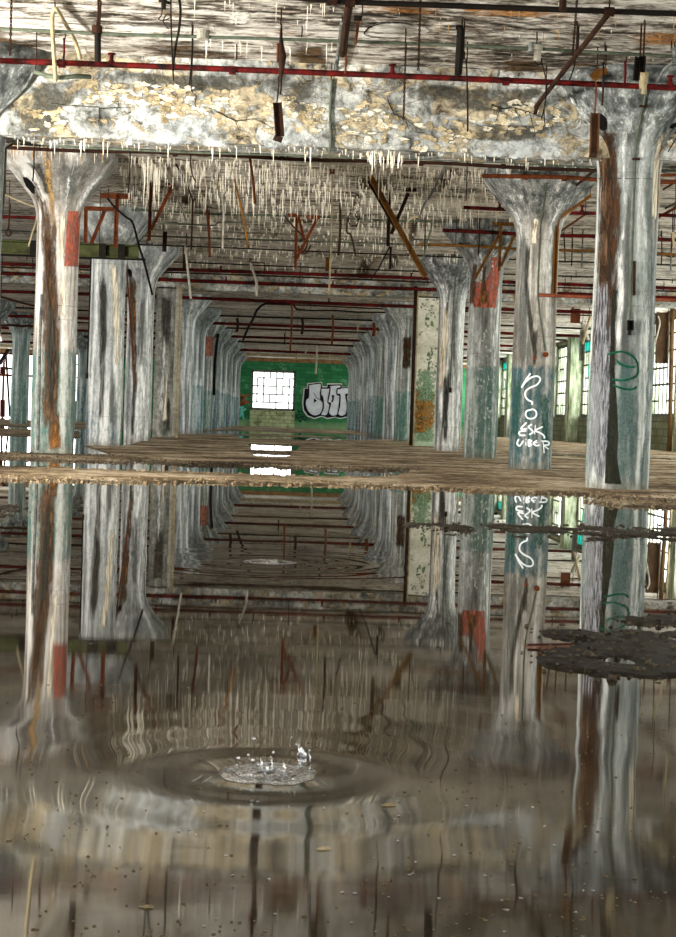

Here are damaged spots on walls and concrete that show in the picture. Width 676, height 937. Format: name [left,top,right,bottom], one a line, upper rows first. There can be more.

peeling [25,107,68,132]
peeling [82,80,238,128]
peeling [258,96,565,153]
rust [592,130,621,370]
rust [34,159,61,449]
rust [469,264,488,304]